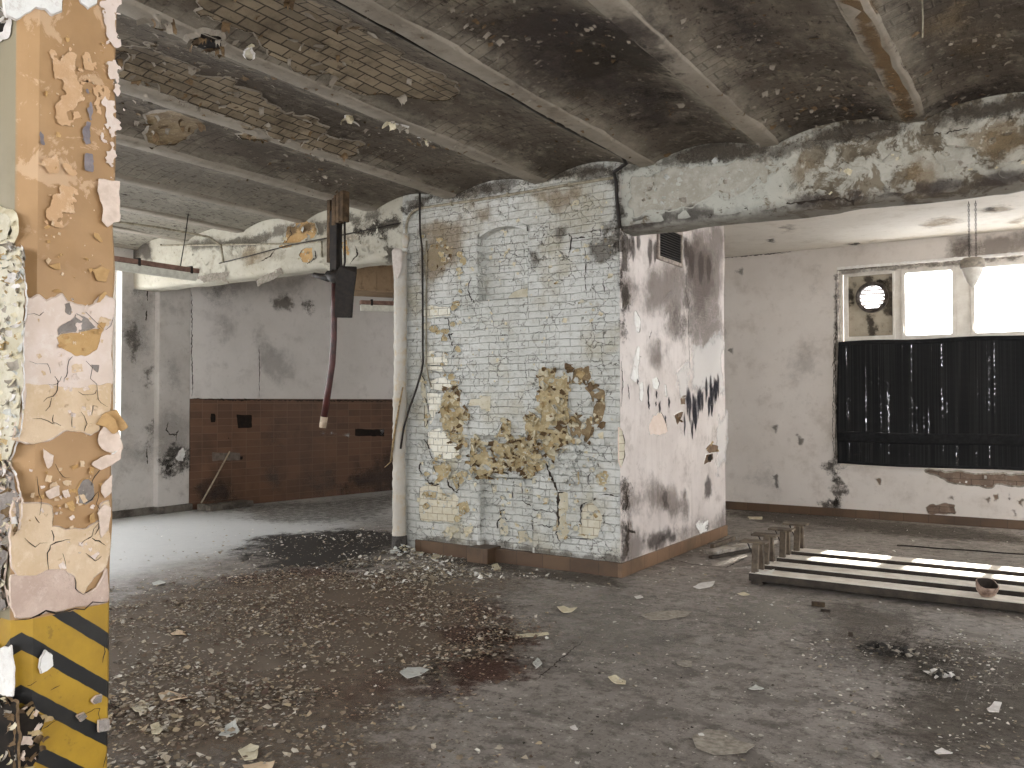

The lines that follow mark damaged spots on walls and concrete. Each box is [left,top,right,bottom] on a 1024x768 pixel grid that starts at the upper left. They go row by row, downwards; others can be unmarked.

flaking render [449,4,630,67]
flaking render [38,0,468,228]
leakage [662,119,906,165]
leakage [927,74,1024,127]
leakage [548,164,657,339]
crack [30,356,104,431]
leakage [158,442,189,476]
peeling [0,206,1024,768]
crack [496,449,635,556]
leakage [621,480,630,562]
leakage [637,362,727,464]
leakage [821,275,884,508]